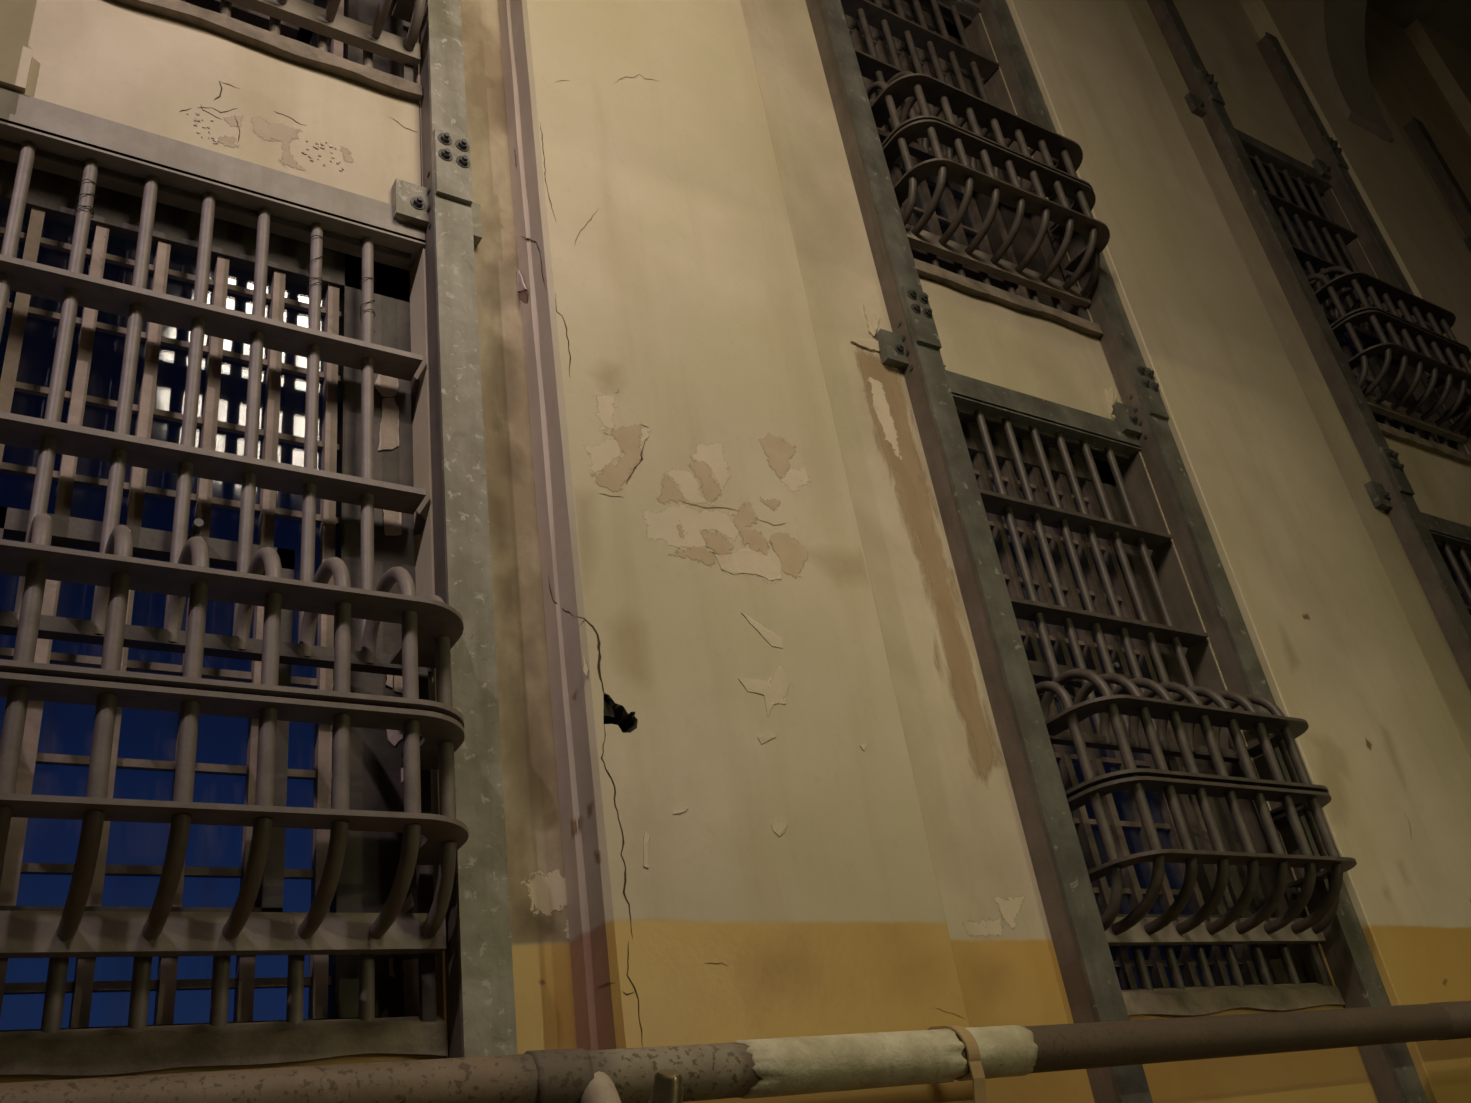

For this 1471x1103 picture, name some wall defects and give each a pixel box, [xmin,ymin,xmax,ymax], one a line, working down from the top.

peeling [584,394,651,492]
peeling [641,433,811,584]
crack [548,576,643,1047]